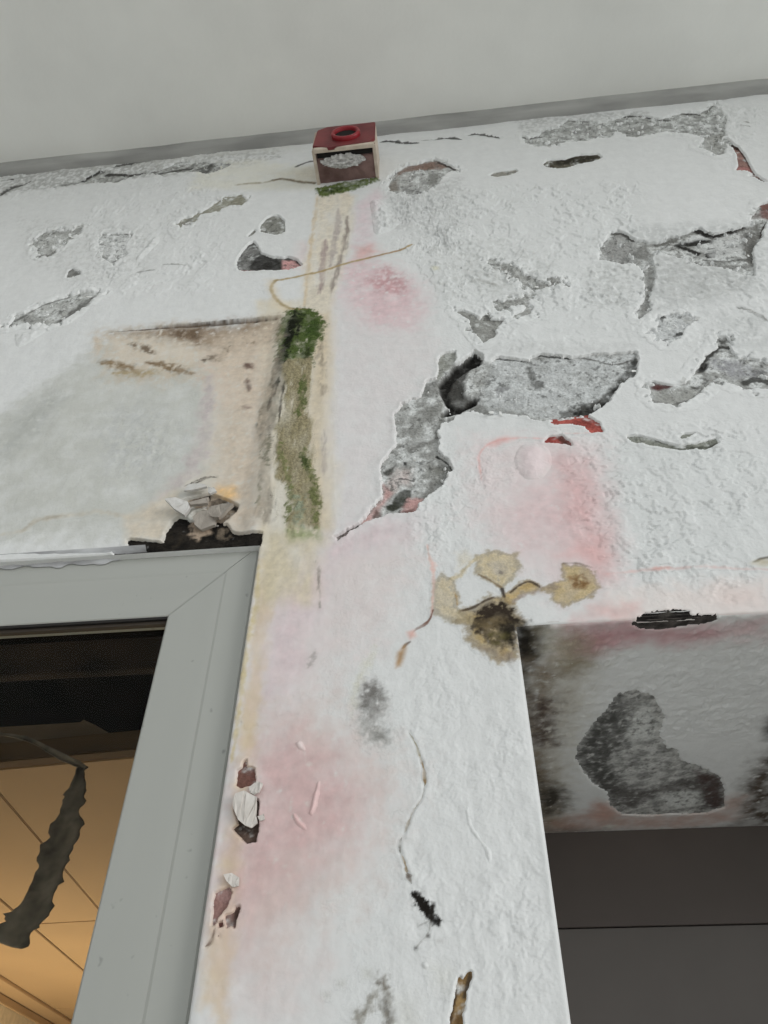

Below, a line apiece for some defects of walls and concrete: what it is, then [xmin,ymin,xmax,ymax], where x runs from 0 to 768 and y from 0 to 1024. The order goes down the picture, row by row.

peeling [515,100,738,159]
flaking render [378,155,468,198]
flaking render [232,213,301,273]
peeling [0,267,112,333]
flaking render [337,196,768,541]
leakage [0,160,360,766]
flaking render [0,491,263,569]
leakage [427,546,613,820]
peeling [233,762,265,844]
crack [398,733,427,884]
peeling [213,873,241,928]
leakage [320,889,479,1024]